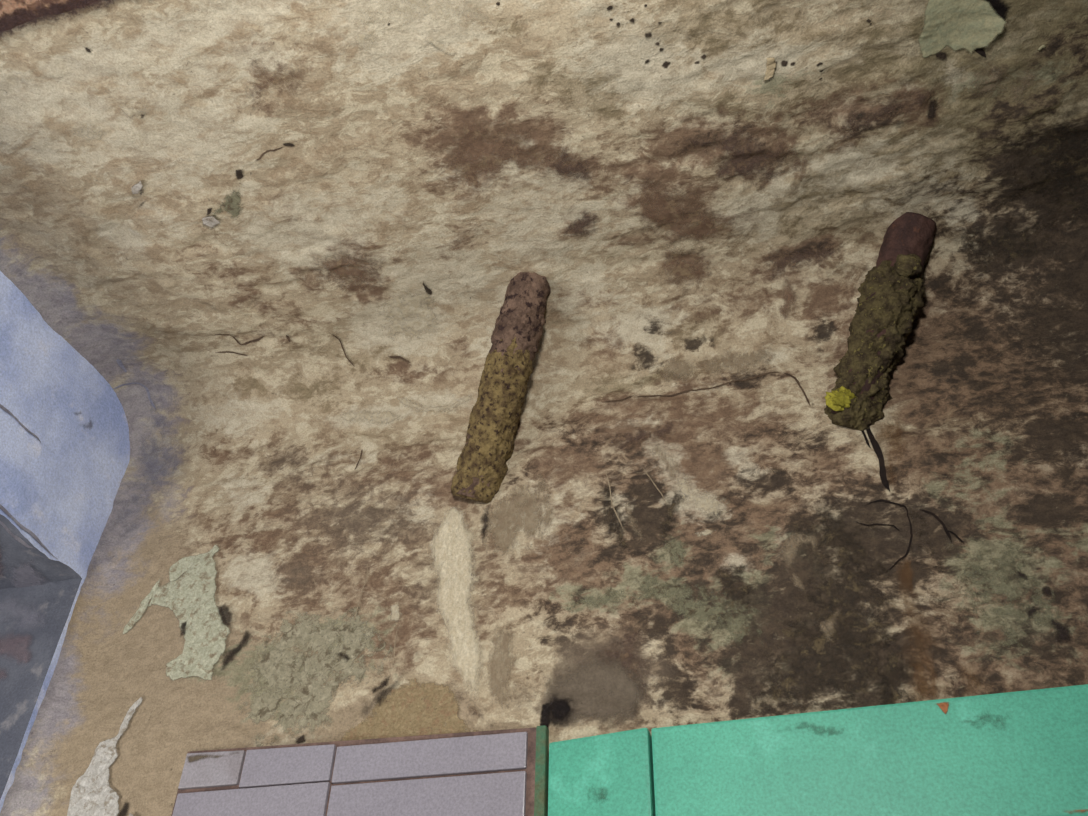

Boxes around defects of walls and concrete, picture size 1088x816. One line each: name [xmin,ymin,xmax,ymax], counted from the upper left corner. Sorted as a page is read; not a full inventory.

rust [0,0,114,37]
peeling [919,0,1009,60]
damp [685,130,807,185]
damp [568,213,597,236]
damp [641,182,731,284]
crack [0,404,41,442]
damp [610,423,726,535]
crack [0,504,56,558]
damp [604,488,634,548]
peeling [123,545,250,680]
damp [760,510,912,707]
peeling [67,697,143,816]